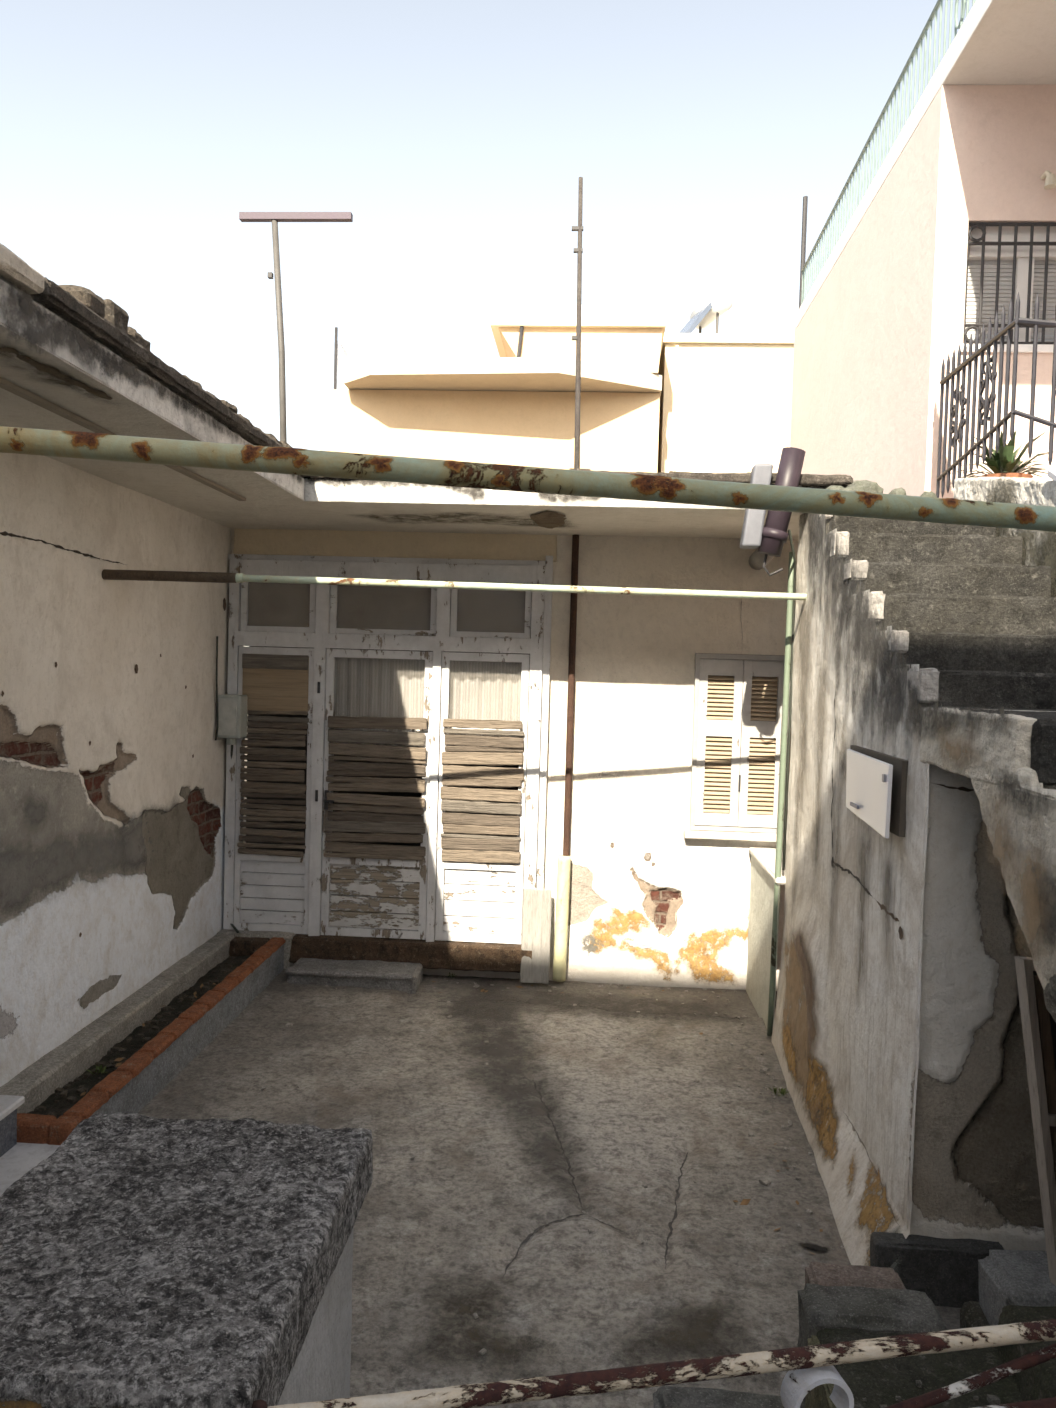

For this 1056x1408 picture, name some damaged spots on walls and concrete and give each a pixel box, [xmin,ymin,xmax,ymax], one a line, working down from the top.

leakage [0,283,238,438]
crack [0,531,122,564]
leakage [292,474,536,526]
leakage [539,493,599,502]
leakage [795,513,1013,878]
peeling [0,691,221,930]
peeling [568,863,609,925]
flaking render [630,853,683,938]
crack [831,681,903,940]
leakage [989,774,1056,946]
peeling [909,822,1044,1231]
crack [503,1080,688,1277]